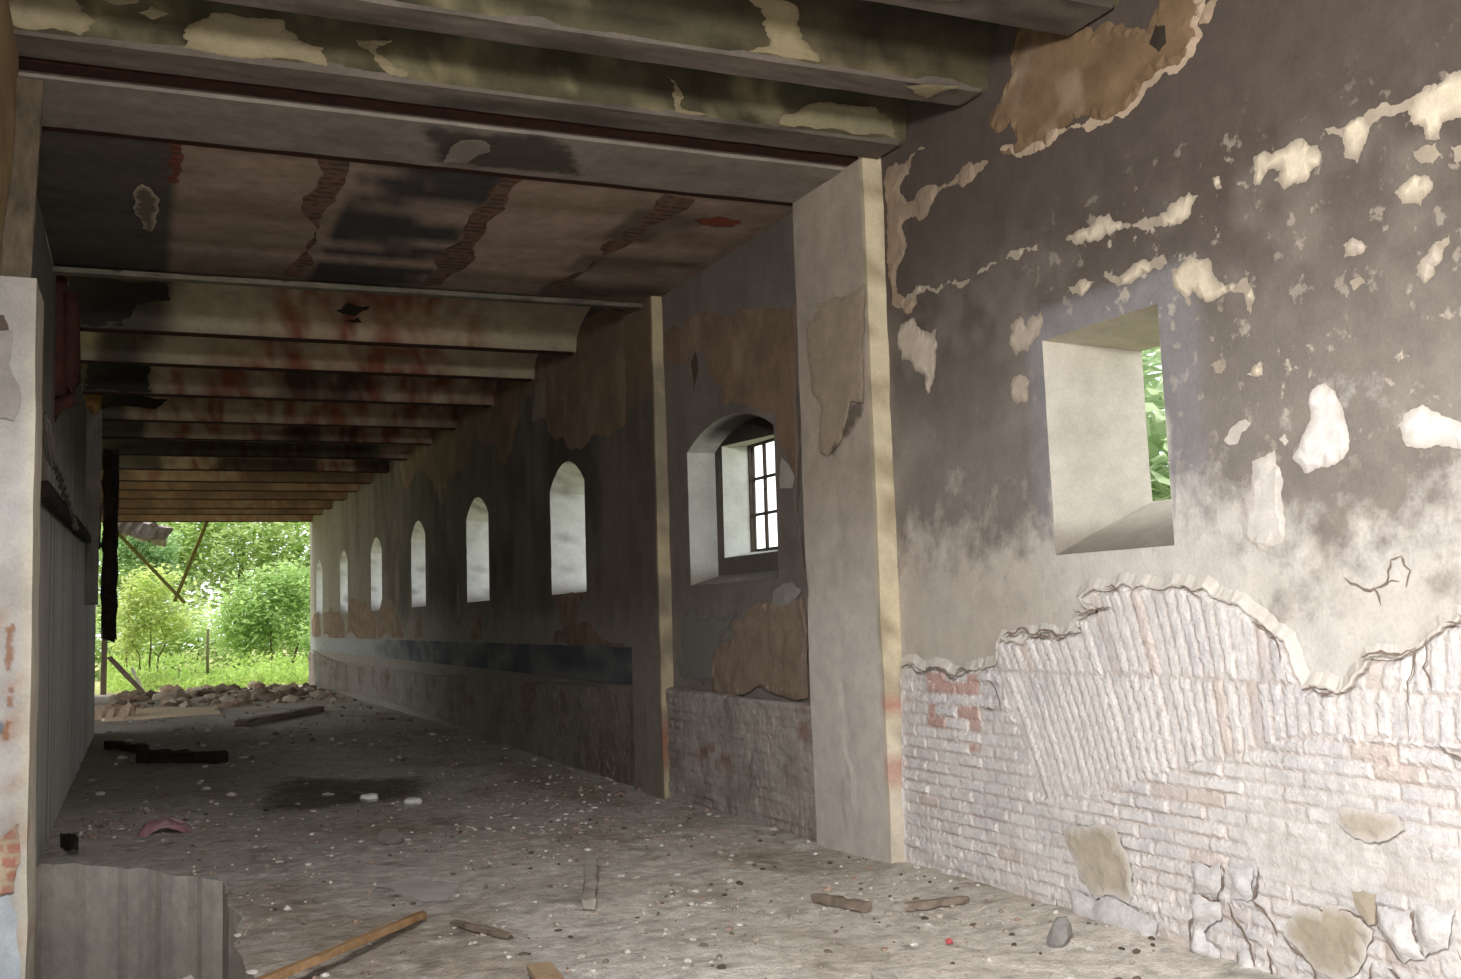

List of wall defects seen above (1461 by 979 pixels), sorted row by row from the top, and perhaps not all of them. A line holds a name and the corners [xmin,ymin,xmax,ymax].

flaking render [183,12,328,67]
flaking render [749,0,820,62]
flaking render [779,102,897,139]
flaking render [884,0,1218,394]
peeling [1253,70,1461,207]
peeling [1068,254,1255,314]
peeling [1242,383,1350,553]
peeling [1398,405,1461,449]
crack [1344,556,1411,605]
flaking render [665,582,817,840]
flaking render [900,571,1461,979]
spalling [0,823,254,979]